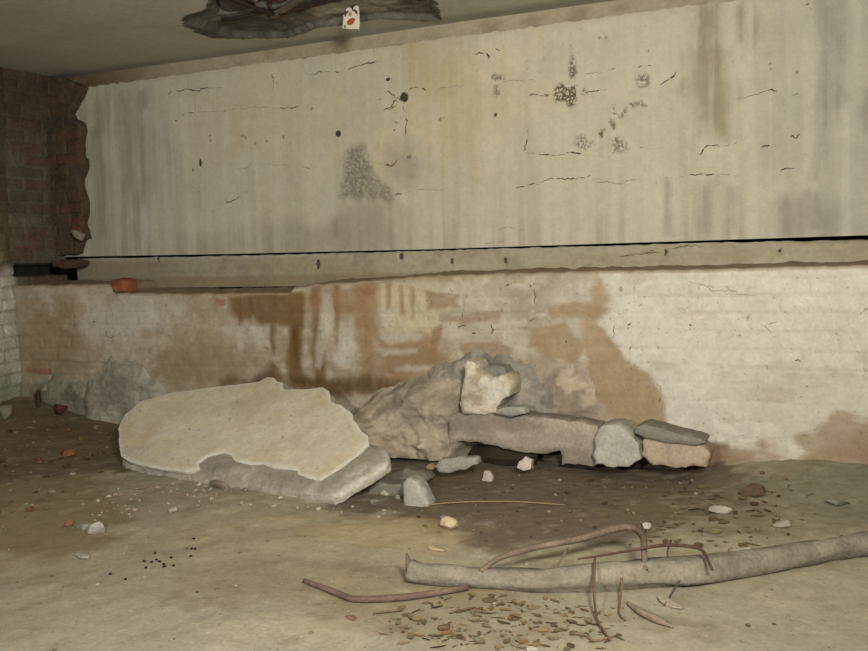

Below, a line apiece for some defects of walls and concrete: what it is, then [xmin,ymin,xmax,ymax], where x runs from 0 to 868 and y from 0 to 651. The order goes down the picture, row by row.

spalling [181,0,442,40]
crack [302,61,376,75]
crack [474,49,549,97]
damp [547,40,593,114]
damp [569,0,787,161]
damp [293,33,509,252]
crack [384,85,463,136]
crack [524,130,582,156]
crack [515,142,737,188]
damp [650,0,868,242]
damp [309,287,362,375]
damp [373,327,440,379]